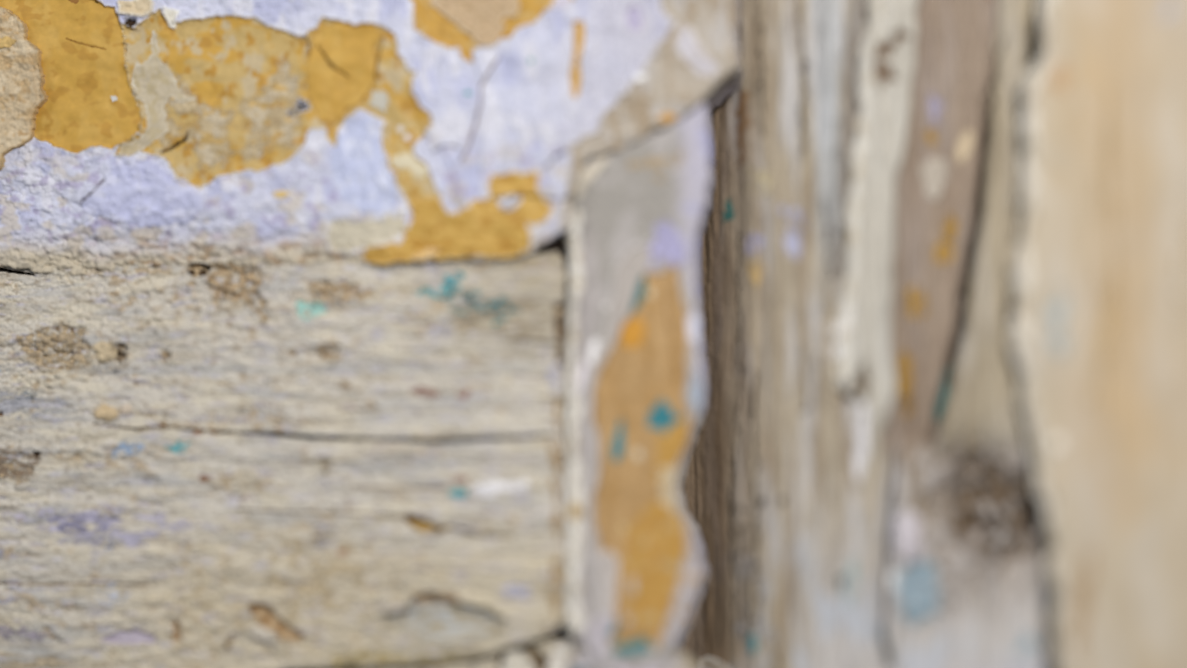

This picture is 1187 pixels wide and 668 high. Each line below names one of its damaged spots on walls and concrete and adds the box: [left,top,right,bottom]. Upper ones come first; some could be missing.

peeling [0,0,741,266]
crack [545,66,742,168]
crack [798,0,808,164]
crack [0,267,35,276]
crack [941,38,1006,419]
crack [93,423,553,444]
peeling [576,236,704,661]
crack [328,642,534,668]
peeling [700,656,729,668]